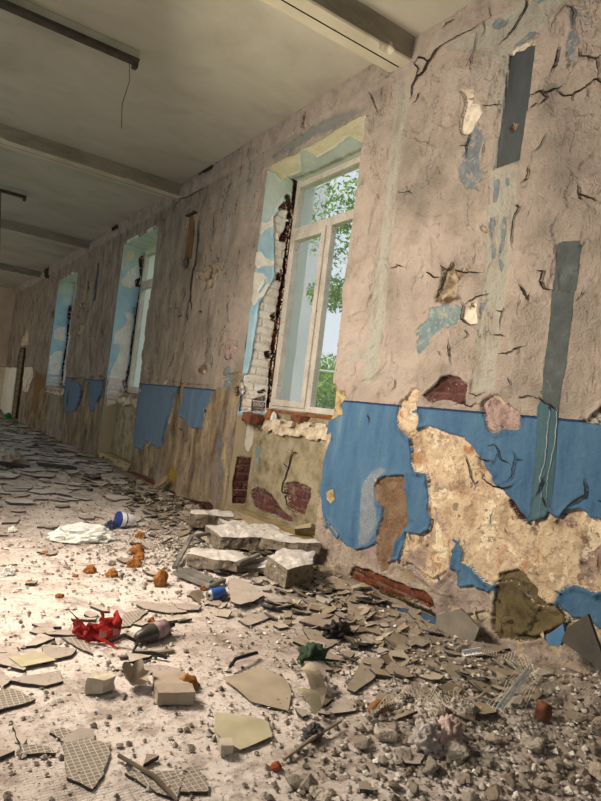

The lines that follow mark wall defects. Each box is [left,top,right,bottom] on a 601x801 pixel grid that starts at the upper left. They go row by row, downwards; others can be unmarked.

crack [409,0,527,103]
crack [530,5,601,108]
flaking render [459,89,482,135]
crack [577,185,595,201]
crack [426,263,483,298]
crack [518,270,551,300]
crack [438,294,528,362]
flaking render [22,367,33,393]
crack [507,378,558,411]
peeling [47,194,601,674]
crack [466,444,522,489]
crack [535,478,601,515]